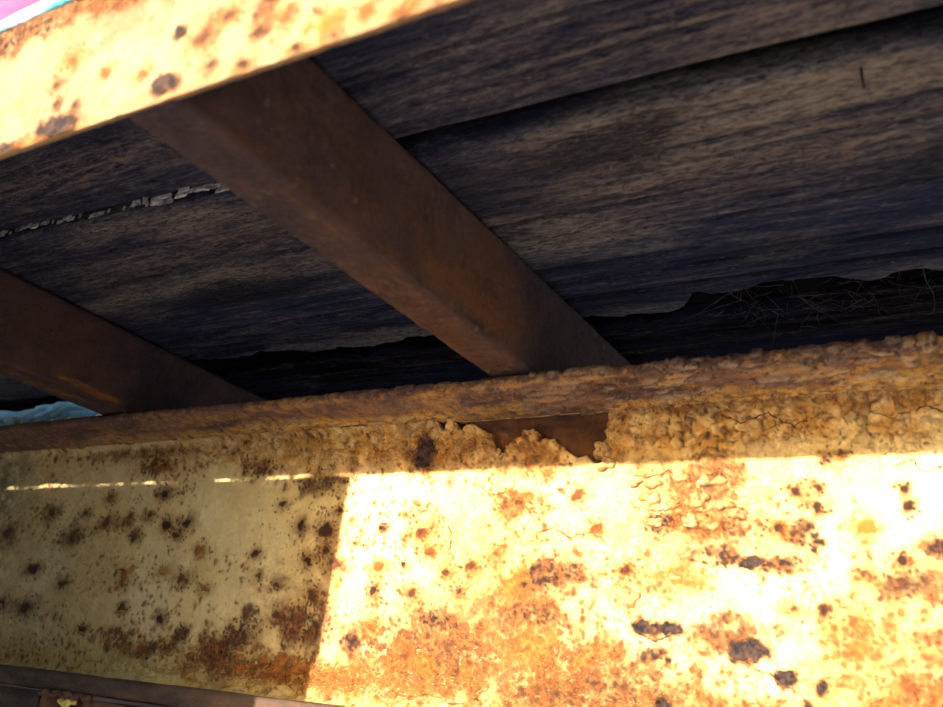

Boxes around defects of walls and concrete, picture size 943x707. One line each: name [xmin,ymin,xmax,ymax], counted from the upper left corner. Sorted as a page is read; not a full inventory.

corrosion [0,0,137,59]
corrosion [182,0,299,77]
spalling [410,435,439,472]
peeling [436,412,609,463]
crack [721,412,820,428]
crack [864,405,943,419]
crack [638,505,753,514]
corrosion [611,447,833,602]
corrosion [892,481,921,520]
corrosion [73,459,747,707]
corrosion [686,609,784,656]
corrosion [777,534,943,687]